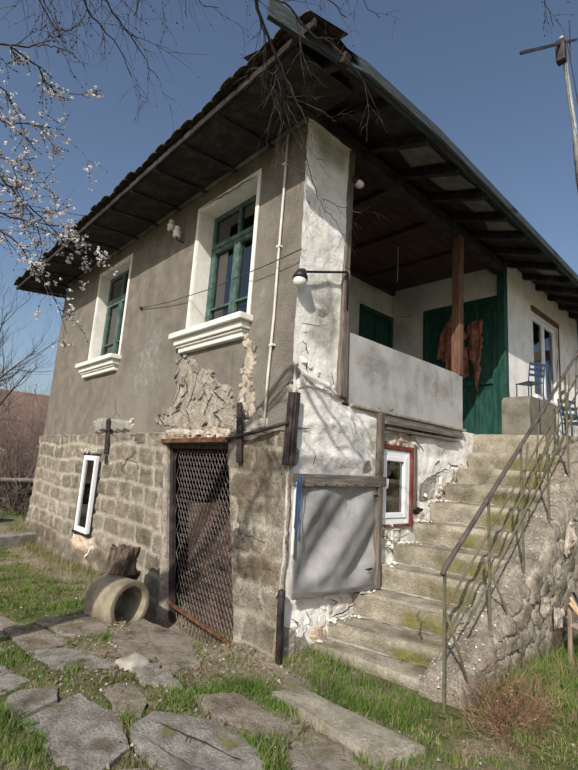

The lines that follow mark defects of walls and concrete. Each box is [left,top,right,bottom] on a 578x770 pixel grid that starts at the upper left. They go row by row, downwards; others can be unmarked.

spalling [154,332,267,438]
spalling [382,463,464,549]
peeling [283,593,356,659]
crack [145,721,243,769]